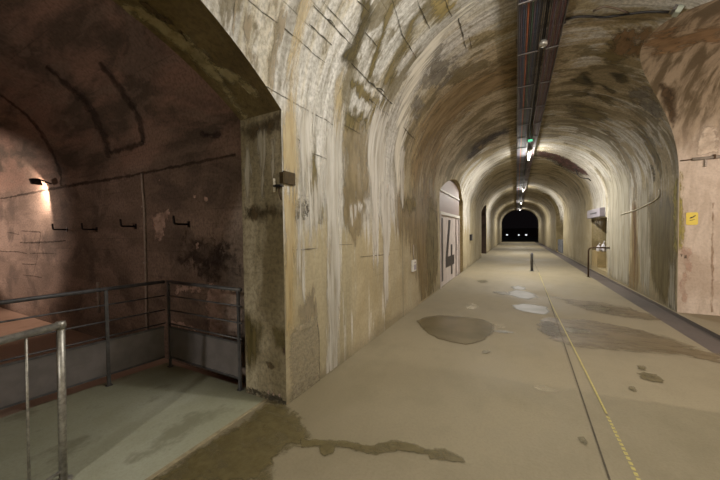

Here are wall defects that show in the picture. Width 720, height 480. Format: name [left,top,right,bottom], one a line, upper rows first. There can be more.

crack [248,0,323,61]
crack [309,4,378,47]
crack [351,63,392,115]
damp [295,0,480,373]
flaking render [153,209,170,241]
damp [273,328,285,349]
damp [539,318,720,362]
damp [153,402,465,480]